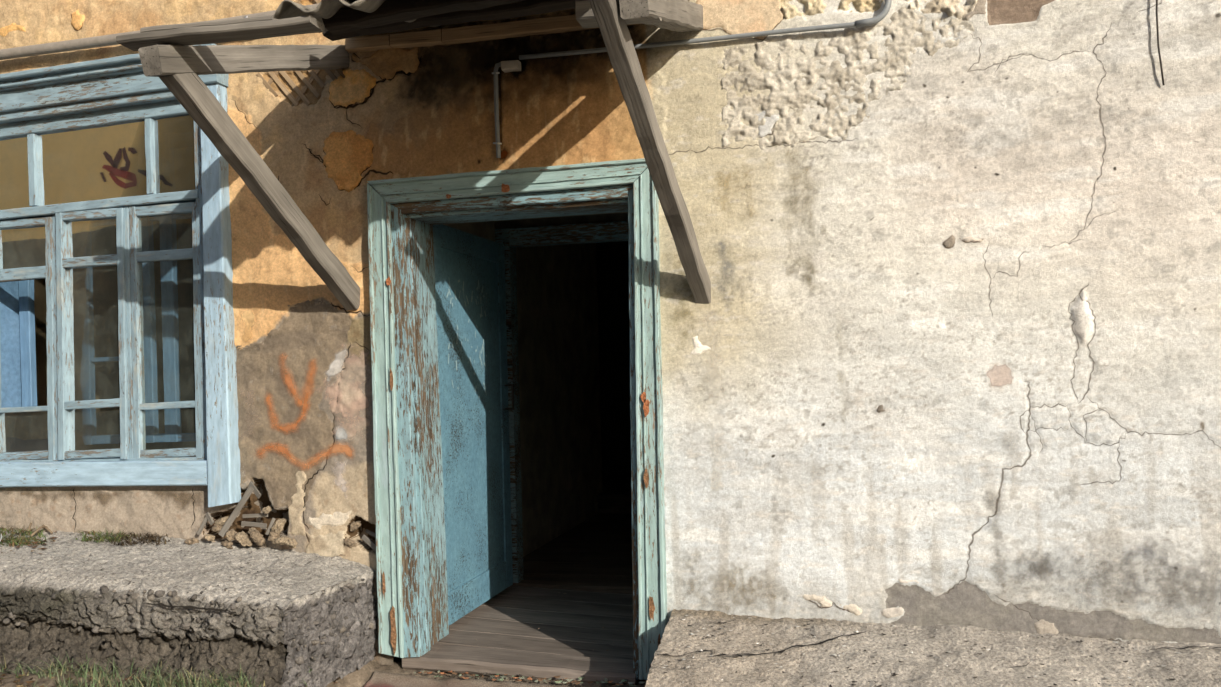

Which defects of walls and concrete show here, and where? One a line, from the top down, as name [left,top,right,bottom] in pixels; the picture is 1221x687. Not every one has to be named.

peeling [328,47,419,108]
leakage [405,31,608,143]
flaking render [696,0,986,150]
peeling [322,130,373,192]
crack [967,26,1115,317]
peeling [184,300,376,557]
crack [946,283,1221,594]
crack [657,620,869,657]
peeling [802,594,862,616]
flaking render [881,579,1221,644]